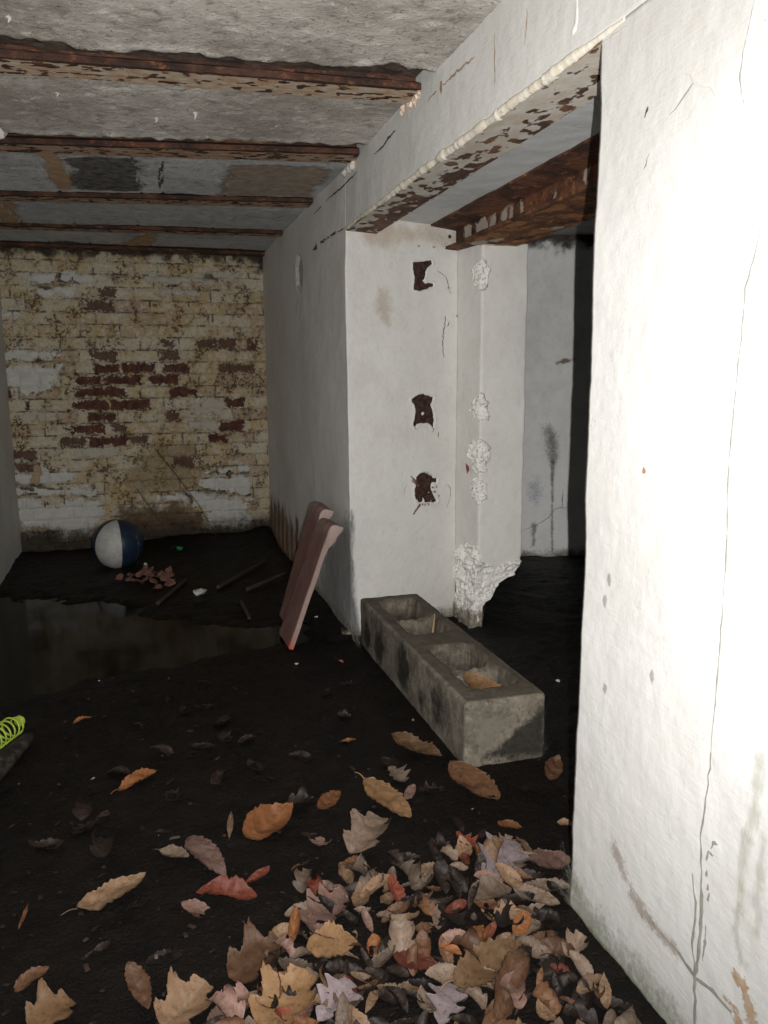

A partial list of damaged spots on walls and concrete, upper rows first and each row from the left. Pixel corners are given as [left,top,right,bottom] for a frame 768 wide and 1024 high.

leakage [64,156,146,192]
rust [470,187,597,247]
peeling [24,269,118,314]
peeling [143,270,242,298]
flaking render [5,337,260,537]
leakage [521,430,585,557]
crack [619,227,761,1024]